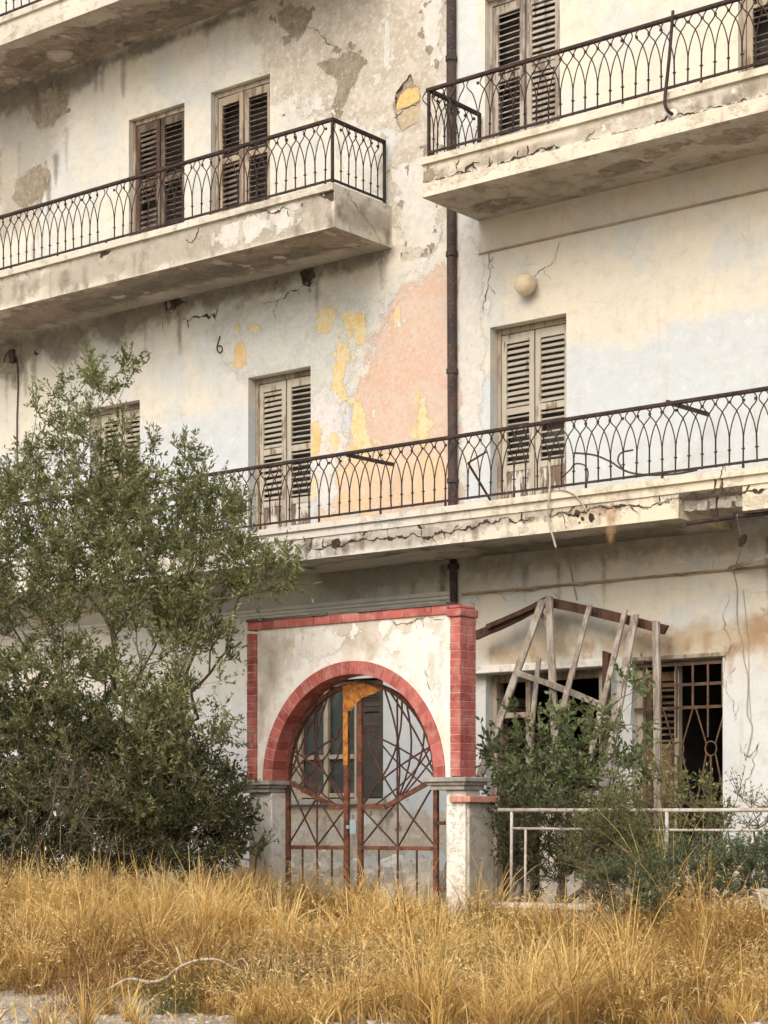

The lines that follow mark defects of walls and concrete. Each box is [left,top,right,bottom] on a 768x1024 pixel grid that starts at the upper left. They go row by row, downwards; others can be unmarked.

crack [426,93,768,183]
peeling [0,0,492,523]
crack [158,308,218,333]
crack [304,462,767,563]
peeling [378,620,444,723]
corrosion [342,683,380,765]